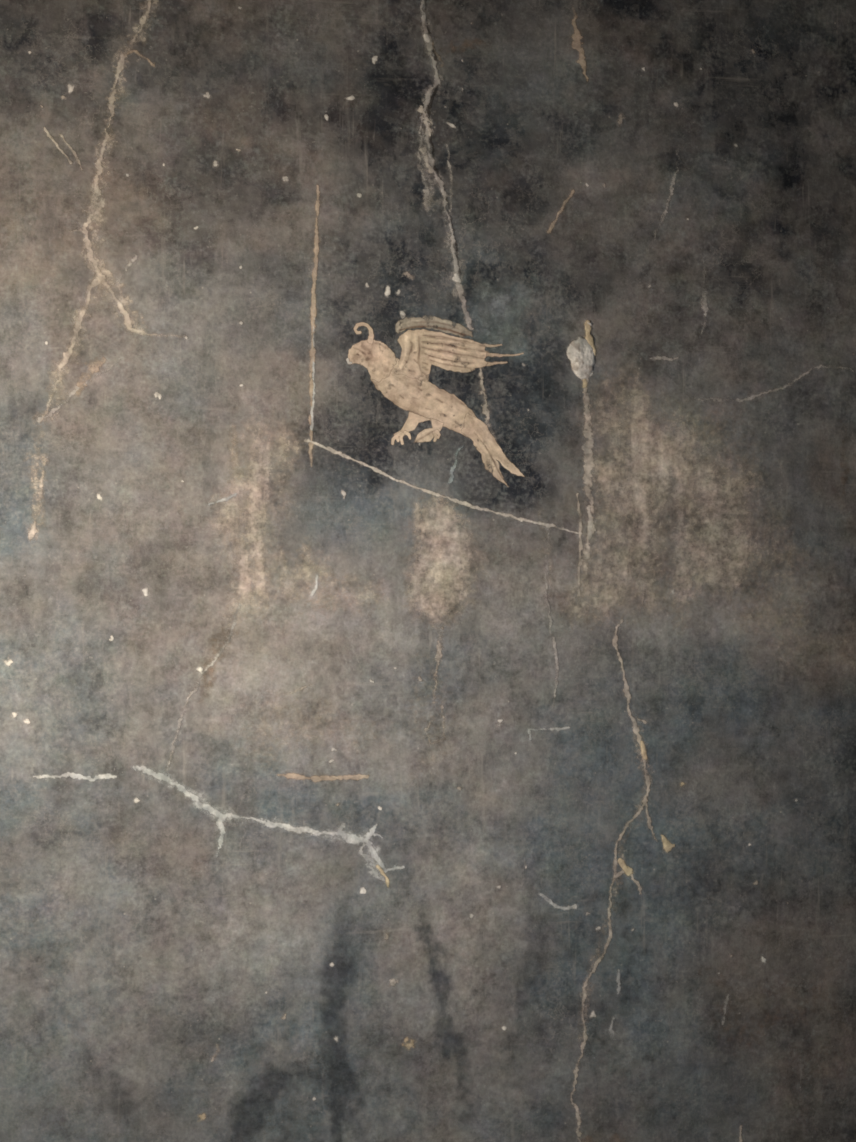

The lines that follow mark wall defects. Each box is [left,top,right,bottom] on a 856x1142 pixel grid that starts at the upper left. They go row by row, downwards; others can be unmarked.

crack [28,0,186,539]
crack [417,0,474,330]
crack [479,368,496,439]
crack [33,603,405,887]
crack [570,582,675,1142]
damp [318,945,362,1142]